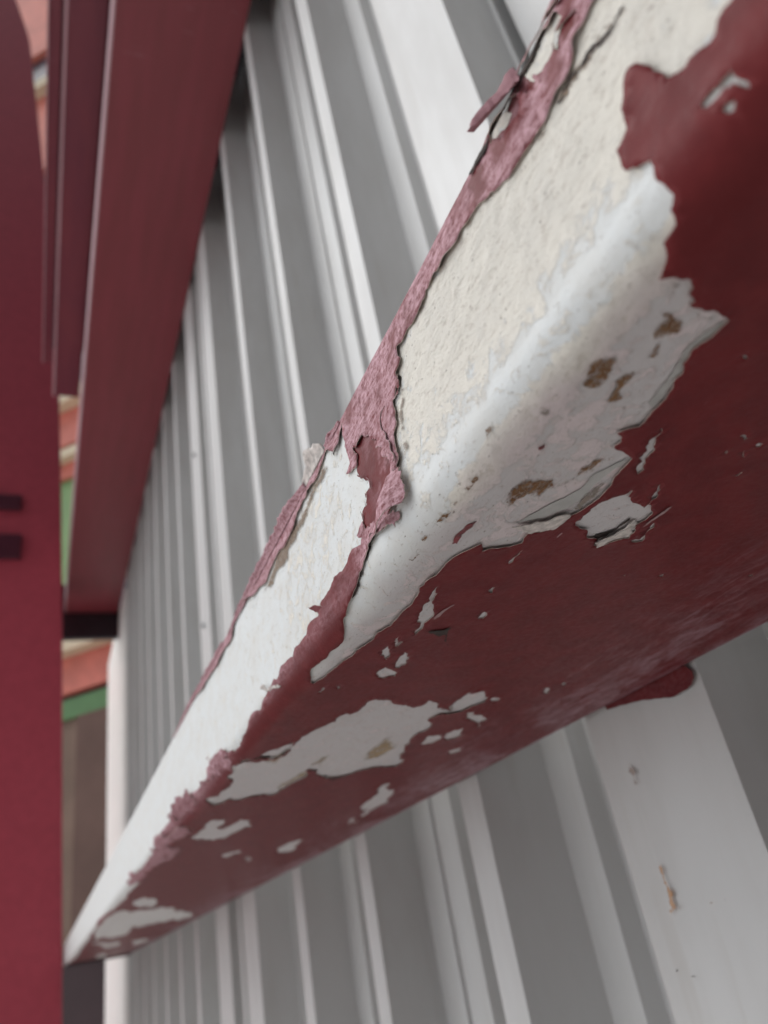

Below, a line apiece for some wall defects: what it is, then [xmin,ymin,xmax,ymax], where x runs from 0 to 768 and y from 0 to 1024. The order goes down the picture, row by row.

peeling [311,0,731,683]
corrosion [650,313,682,358]
corrosion [583,359,635,402]
corrosion [505,480,559,508]
peeling [63,420,488,967]